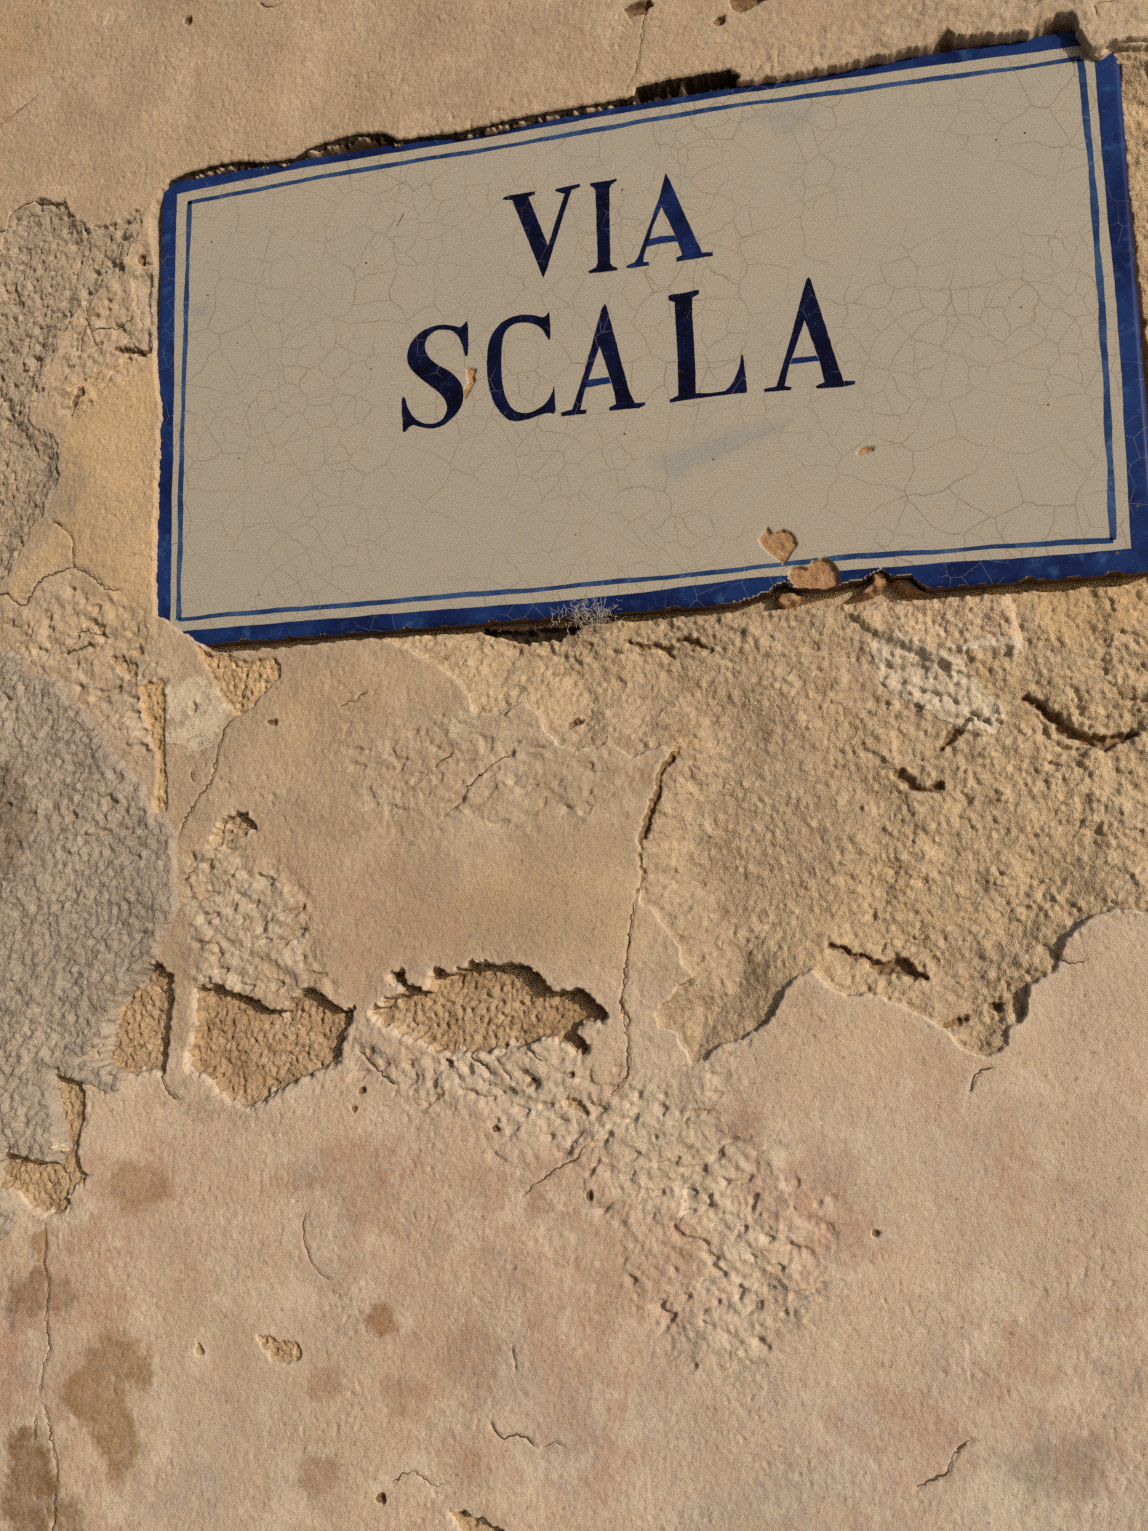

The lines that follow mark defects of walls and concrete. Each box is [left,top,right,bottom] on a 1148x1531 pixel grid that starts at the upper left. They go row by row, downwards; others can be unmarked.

peeling [0,198,160,581]
flaking render [110,656,168,813]
crack [1020,693,1138,753]
flaking render [109,963,175,1076]
flaking render [189,958,608,1108]
crack [527,751,679,1193]
crack [827,942,929,981]
crack [942,1002,1006,1029]
flaking render [0,1076,88,1216]
flaking render [564,1097,589,1116]
crack [34,1224,58,1531]
flaking render [452,1511,504,1531]